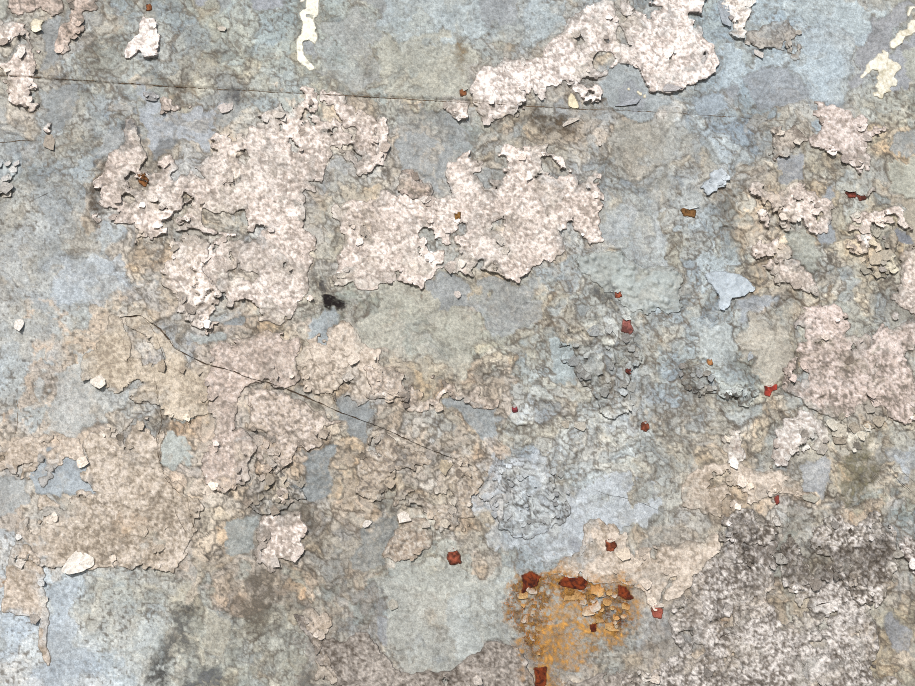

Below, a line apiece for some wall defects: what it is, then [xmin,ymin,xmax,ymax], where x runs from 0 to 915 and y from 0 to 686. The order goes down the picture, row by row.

peeling [0,0,99,113]
peeling [443,0,720,125]
peeling [768,101,886,174]
peeling [331,143,604,291]
peeling [80,86,500,574]
peeling [0,416,205,666]
crack [123,314,472,559]
peeling [355,427,571,563]
peeling [550,181,915,686]
peeling [293,607,535,686]
rust [504,566,639,686]
rust [651,602,664,619]